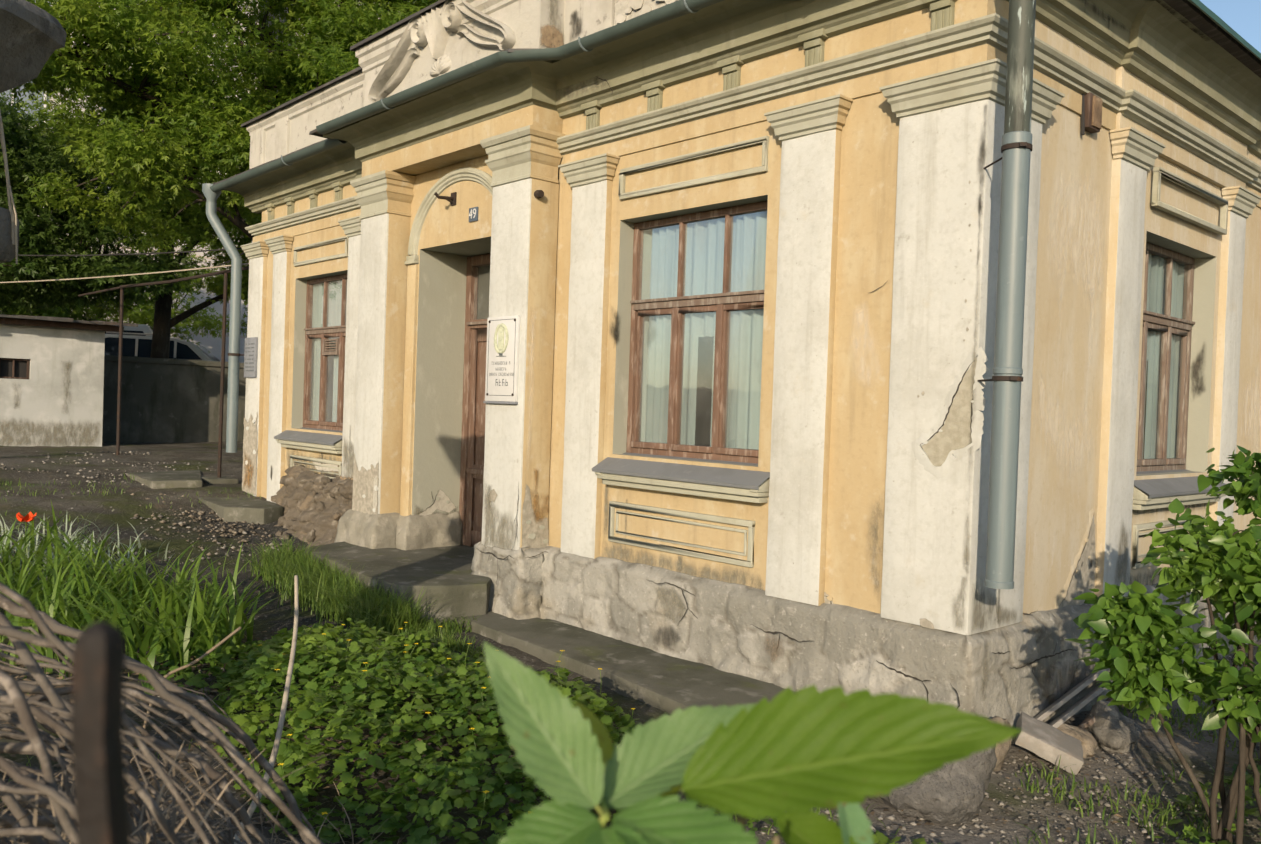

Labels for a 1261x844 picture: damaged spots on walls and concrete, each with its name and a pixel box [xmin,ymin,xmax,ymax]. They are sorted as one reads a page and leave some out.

flaking render [541,25,564,48]
spalling [614,0,678,25]
spalling [911,318,989,479]
peeling [242,414,258,495]
spalling [271,454,379,548]
flaking render [522,484,549,551]
crack [646,579,698,624]
crack [751,624,810,648]